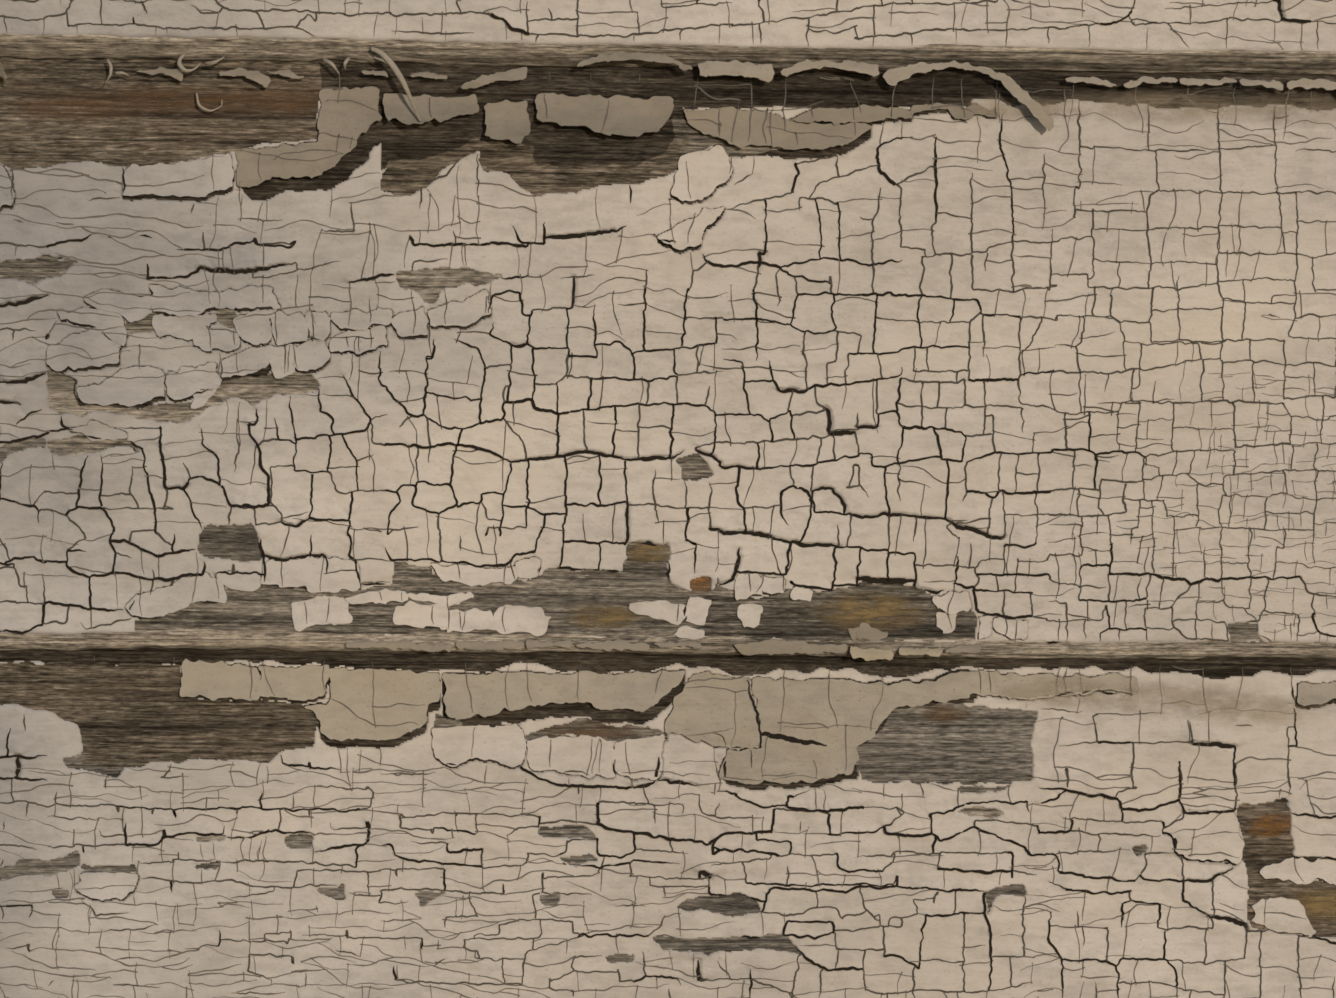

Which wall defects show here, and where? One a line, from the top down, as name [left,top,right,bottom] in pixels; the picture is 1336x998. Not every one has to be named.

crack [0,0,1336,72]
peeling [0,57,999,250]
crack [0,68,1336,644]
peeling [125,543,1028,642]
peeling [0,659,1138,786]
peeling [1297,681,1336,706]
crack [0,658,1336,998]
peeling [1163,798,1336,939]